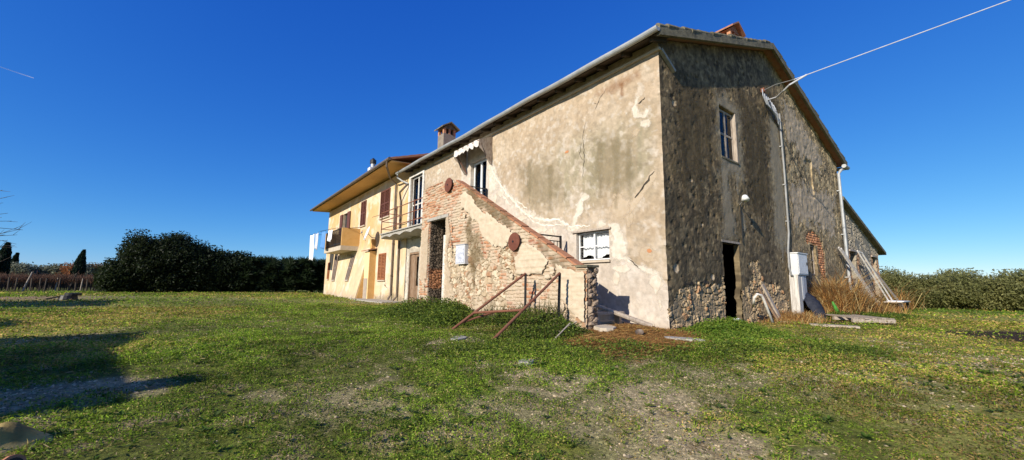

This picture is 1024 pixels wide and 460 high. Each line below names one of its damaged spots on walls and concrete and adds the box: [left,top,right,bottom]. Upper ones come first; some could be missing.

peeling [626,96,650,136]
peeling [443,217,464,302]
spalling [459,162,727,330]